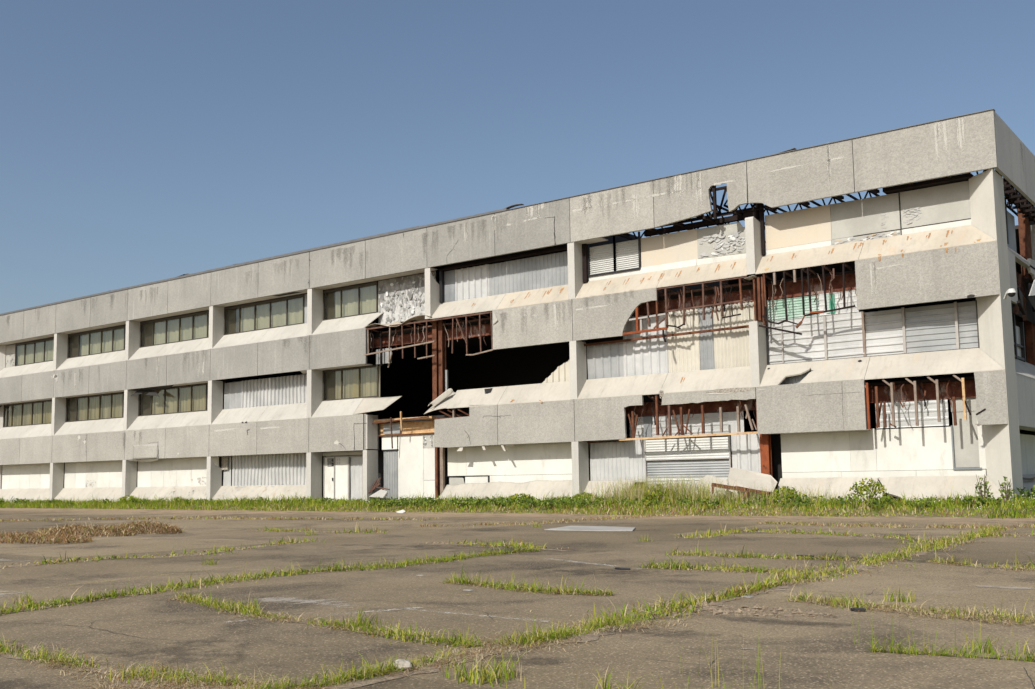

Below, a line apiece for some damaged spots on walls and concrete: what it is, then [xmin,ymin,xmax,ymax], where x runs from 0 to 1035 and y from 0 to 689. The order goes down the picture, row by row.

peeling [699,230,746,257]
peeling [378,276,435,324]